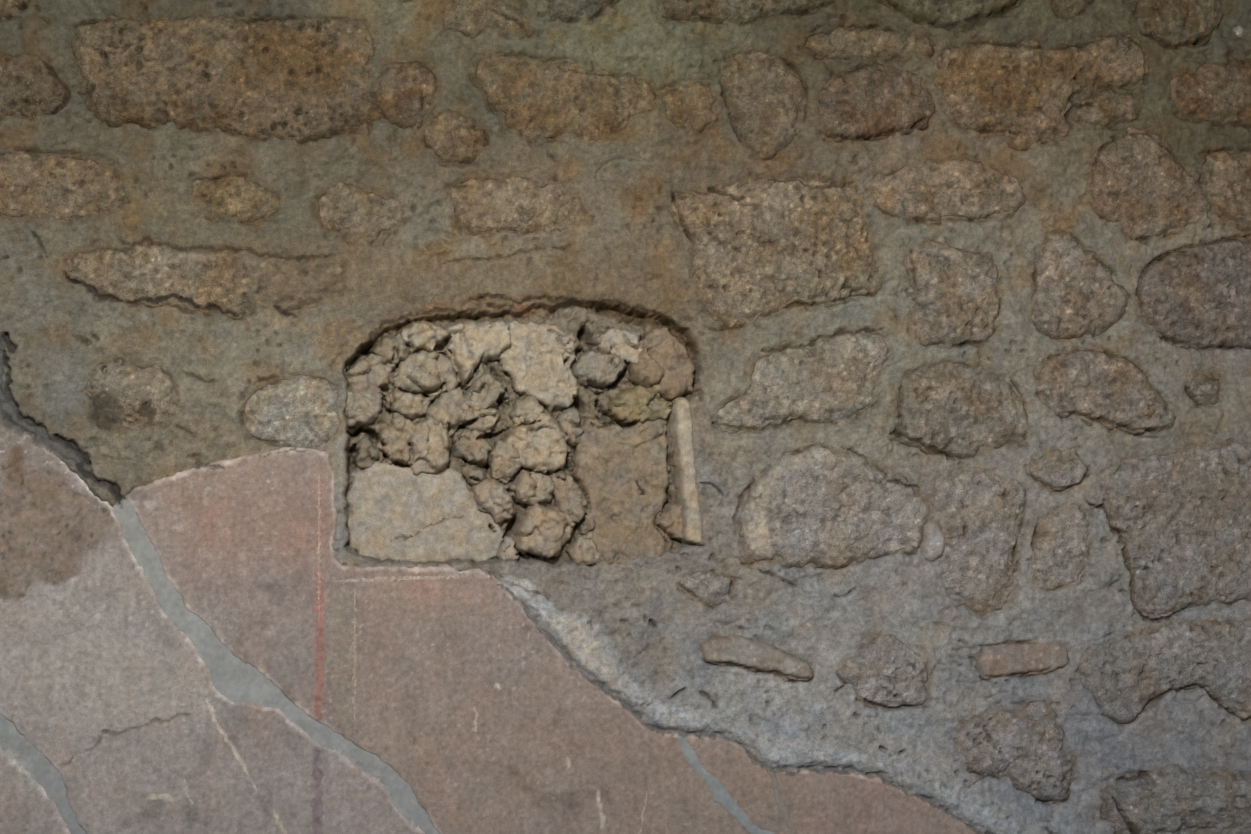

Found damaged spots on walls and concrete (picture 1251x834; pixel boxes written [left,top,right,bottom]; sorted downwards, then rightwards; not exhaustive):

spalling [359,290,564,356]
spalling [86,388,157,432]
flaking render [0,444,110,602]